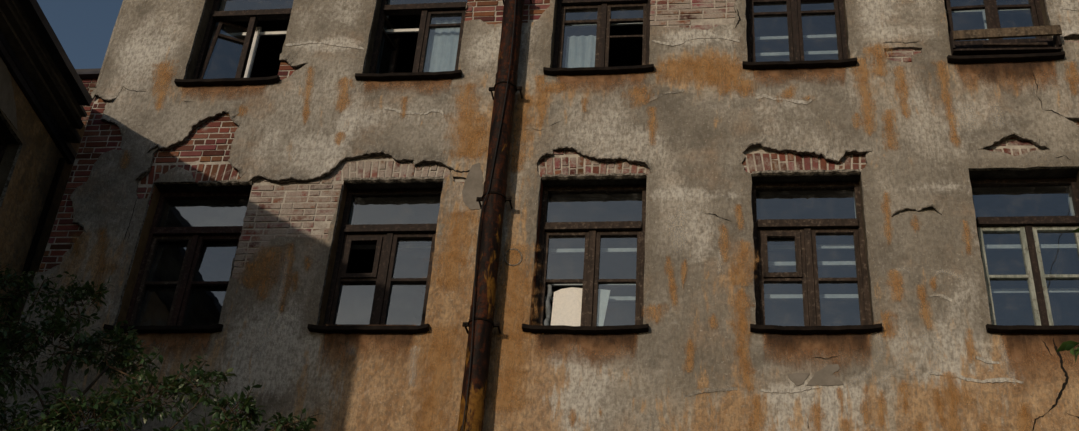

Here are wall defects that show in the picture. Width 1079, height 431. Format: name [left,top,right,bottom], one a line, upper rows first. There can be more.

flaking render [465,0,504,24]
flaking render [522,0,550,23]
flaking render [650,0,736,30]
corrosion [508,75,566,172]
flaking render [534,136,654,177]
flaking render [740,132,872,173]
flaking render [977,122,1050,156]
flaking render [38,87,129,272]
flaking render [134,100,460,279]
corrosion [487,244,531,411]
water stain [764,333,870,365]
water stain [1002,333,1079,381]